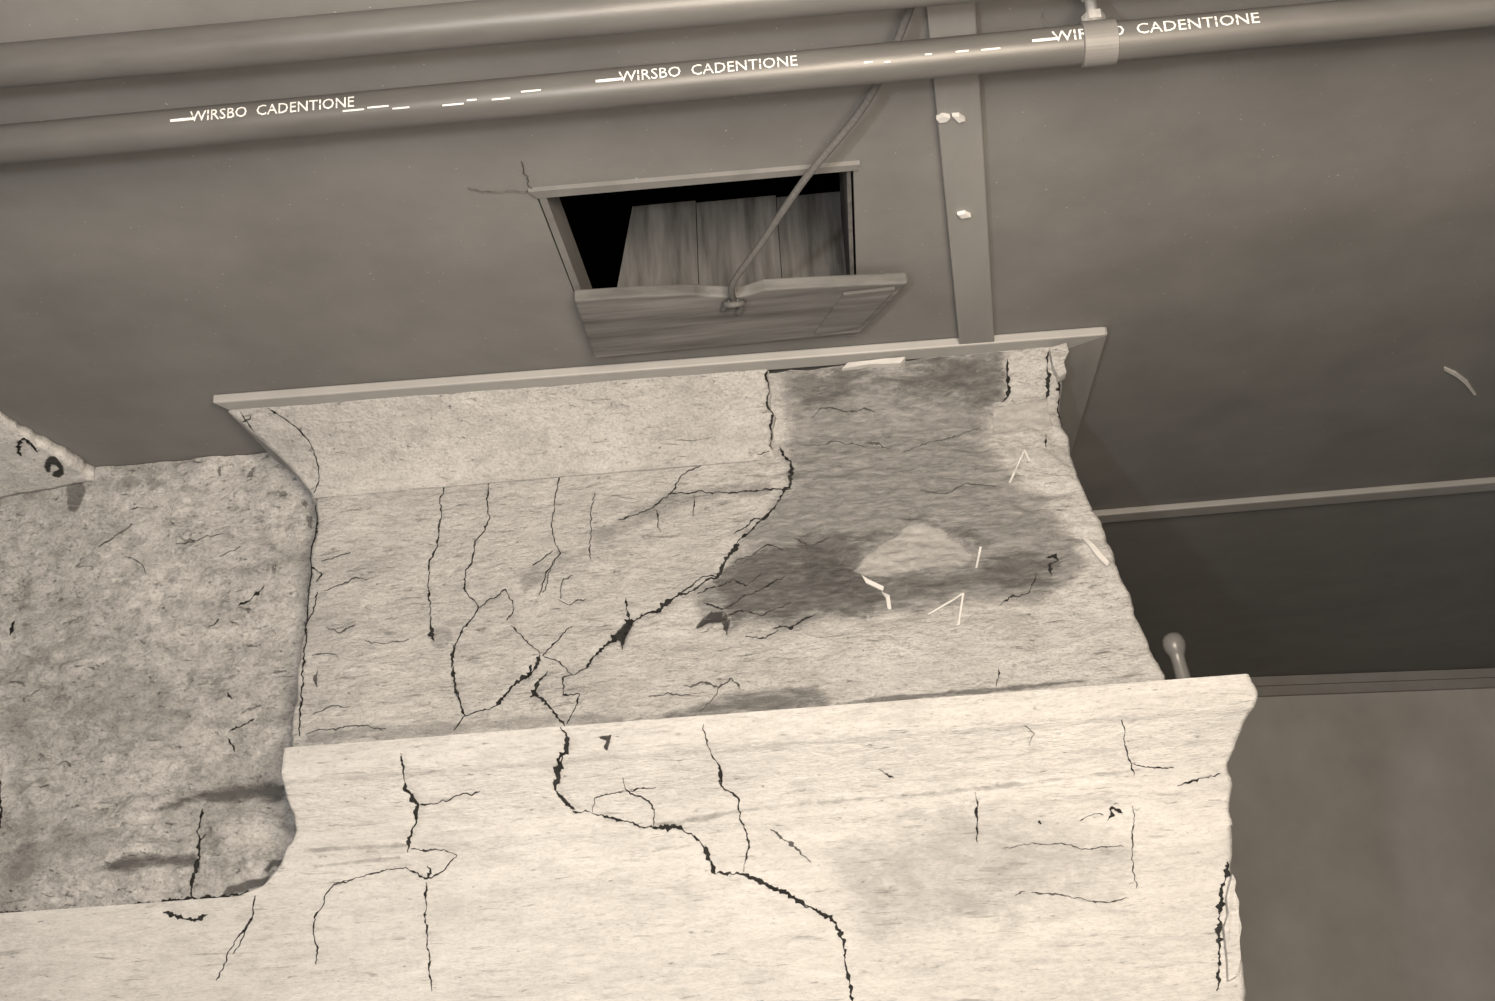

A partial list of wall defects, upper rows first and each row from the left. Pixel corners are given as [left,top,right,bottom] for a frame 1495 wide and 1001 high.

damp [806,369,864,401]
damp [884,356,1004,405]
damp [800,533,1052,605]
crack [240,352,1062,1001]
damp [161,783,285,810]
crack [974,720,1221,903]
damp [105,856,198,871]
damp [224,860,282,895]
crack [1215,862,1231,991]